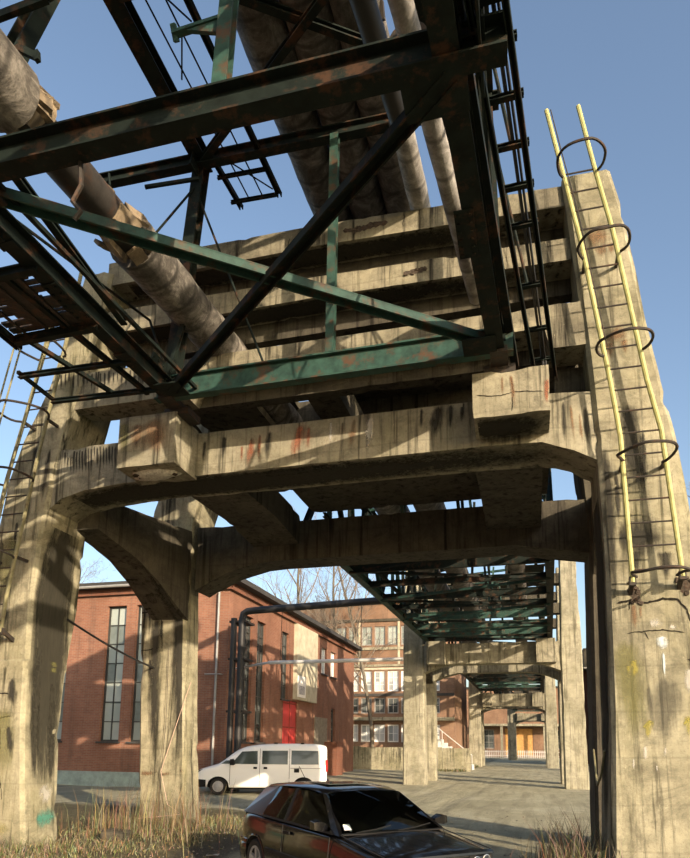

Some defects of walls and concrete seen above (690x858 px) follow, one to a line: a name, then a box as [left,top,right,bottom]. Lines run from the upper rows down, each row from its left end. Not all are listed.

water stain [64,446,118,471]
water stain [622,406,646,488]
water stain [30,528,77,800]
water stain [142,565,184,752]
water stain [593,453,674,815]
crack [617,597,690,638]